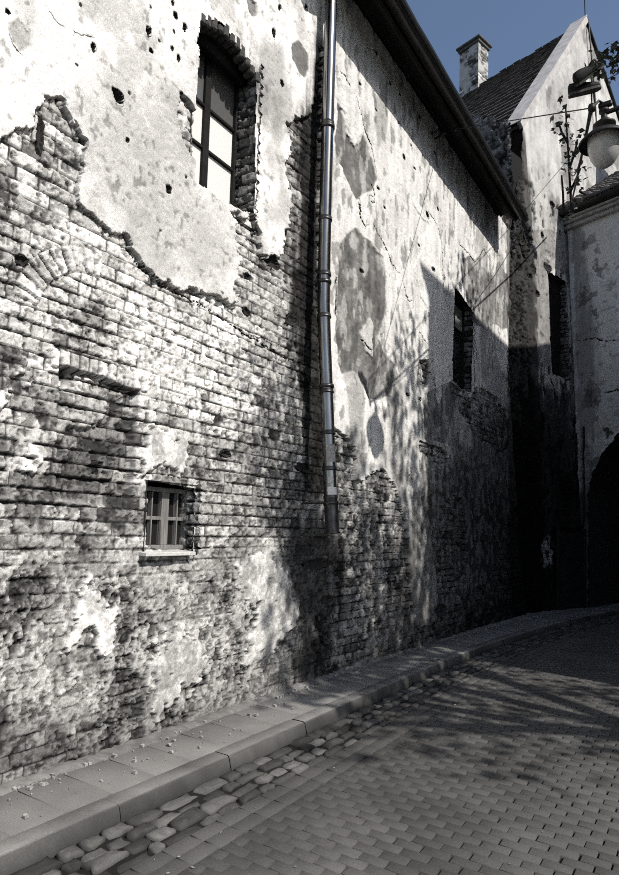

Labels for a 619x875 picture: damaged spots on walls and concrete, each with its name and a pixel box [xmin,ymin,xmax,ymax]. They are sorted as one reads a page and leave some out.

peeling [5,8,31,53]
water stain [346,0,510,281]
water stain [521,131,535,231]
spalling [0,40,567,785]
water stain [405,292,517,628]
peeling [579,379,602,411]